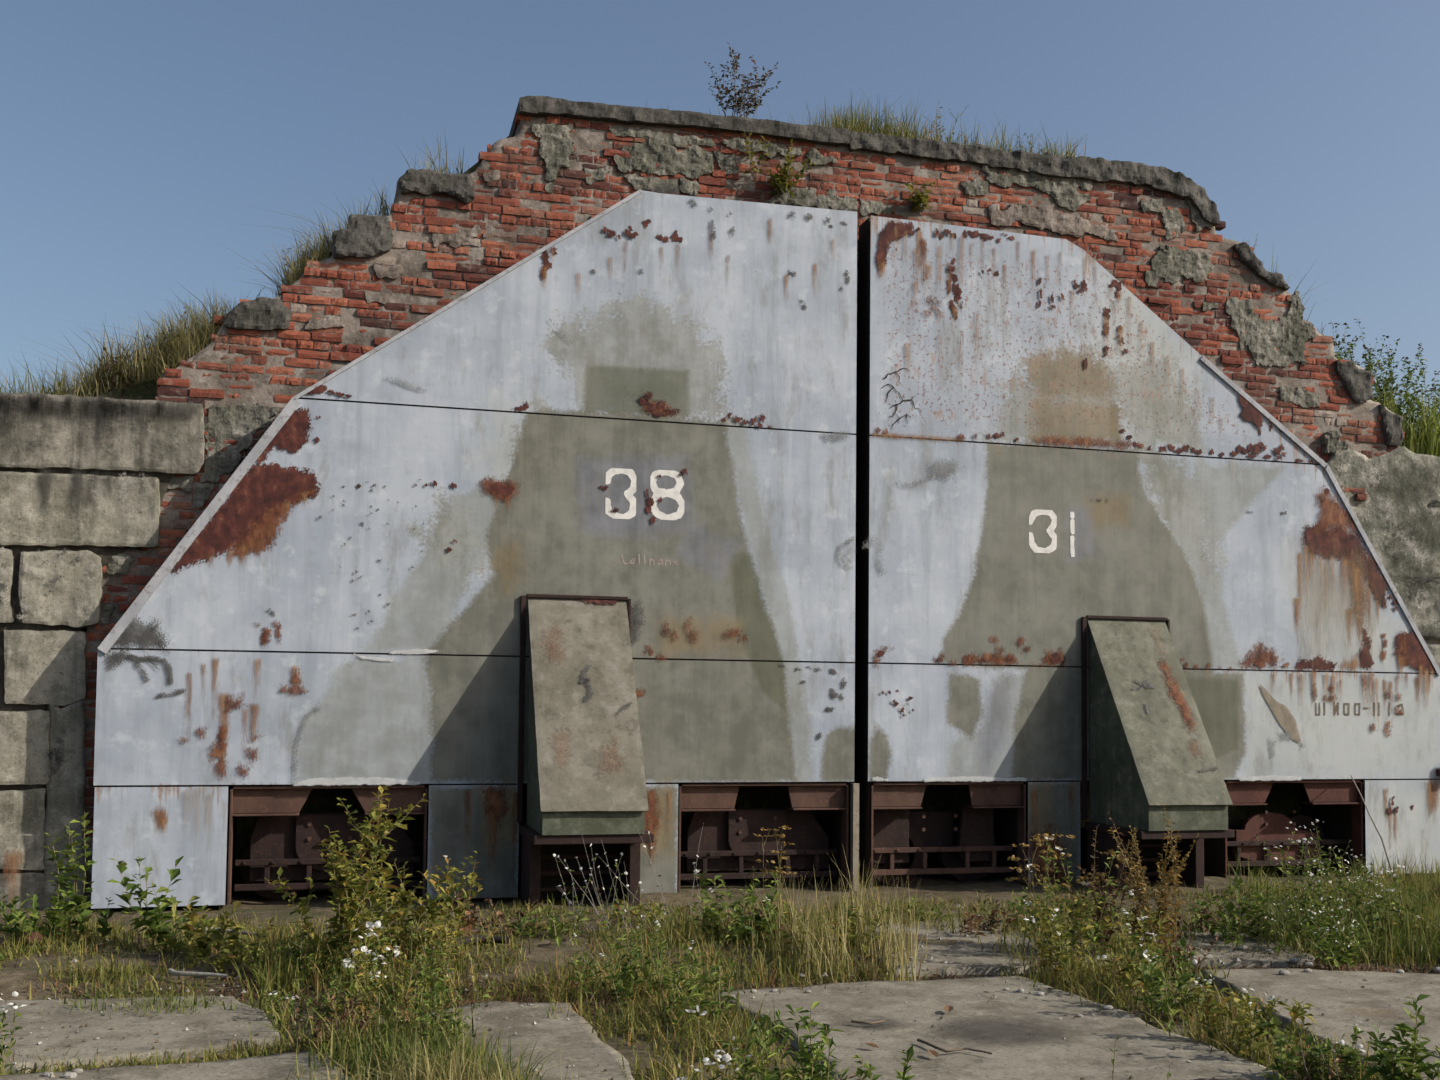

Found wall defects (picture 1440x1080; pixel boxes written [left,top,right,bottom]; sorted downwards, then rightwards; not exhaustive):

peeling [531,123,837,243]
corrosion [895,228,977,344]
peeling [768,164,1118,276]
peeling [1038,277,1088,309]
peeling [1140,199,1214,287]
peeling [1201,291,1316,367]
peeling [1120,386,1348,463]
corrosion [1158,485,1436,737]
corrosion [182,659,261,778]
corrosion [281,665,308,694]
corrosion [645,790,671,853]
corrosion [1384,780,1439,834]